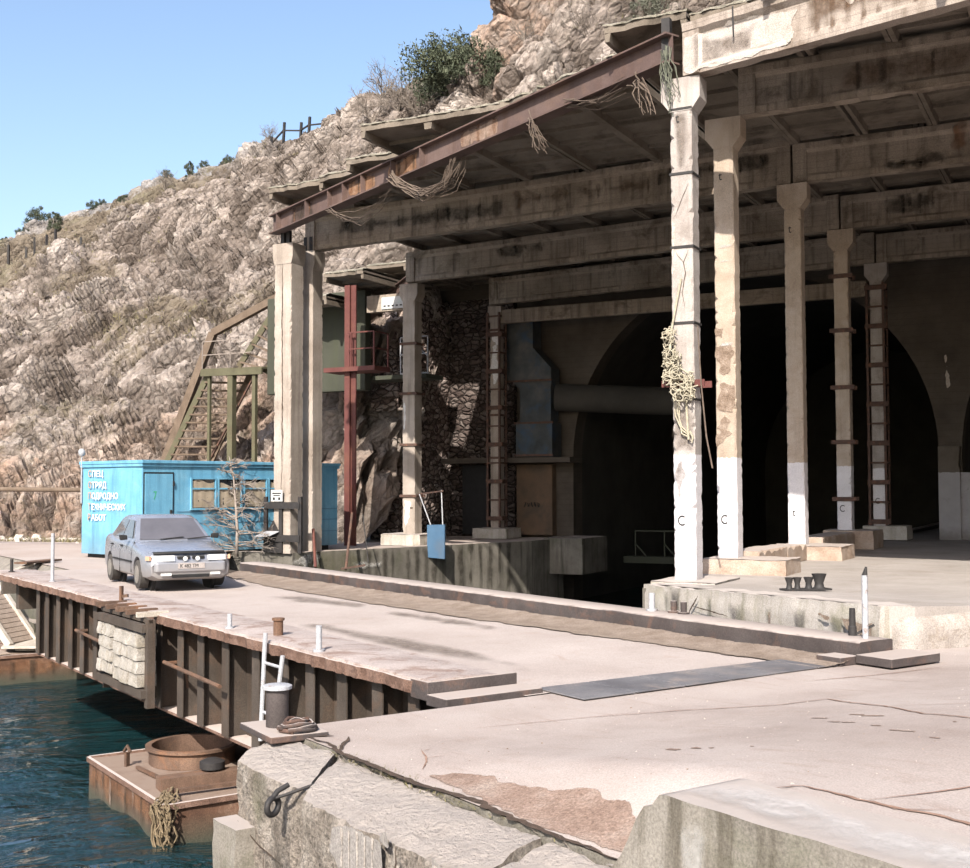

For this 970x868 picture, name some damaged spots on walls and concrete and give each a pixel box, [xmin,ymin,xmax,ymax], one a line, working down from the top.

corrosion [460,119,498,147]
corrosion [349,176,375,196]
corrosion [388,153,417,180]
peeling [715,328,735,446]
crack [310,735,618,860]
spalling [430,773,636,852]
crack [777,785,970,825]